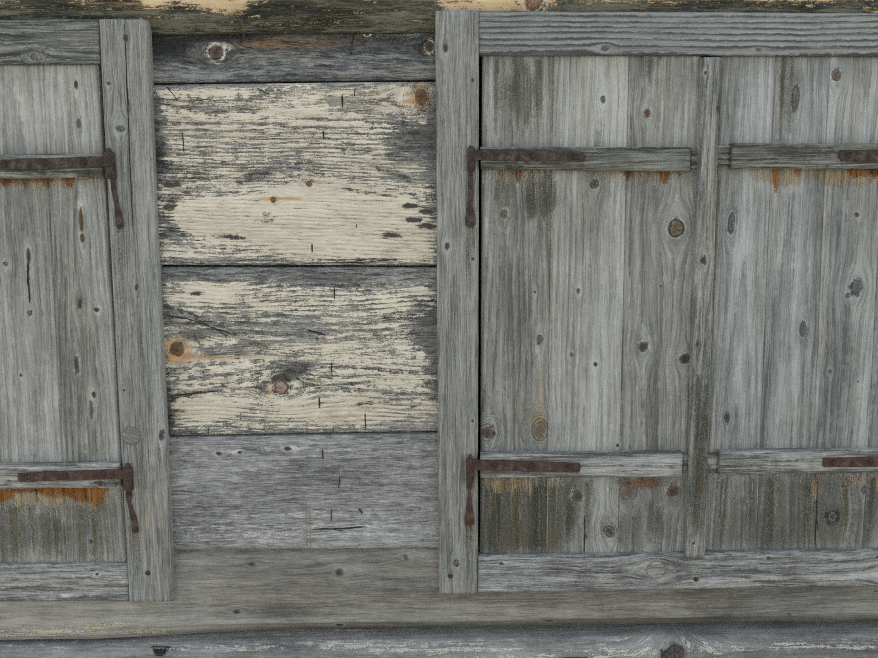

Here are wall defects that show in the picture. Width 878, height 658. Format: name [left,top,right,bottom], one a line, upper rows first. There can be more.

corrosion [0,178,92,189]
peeling [153,82,437,265]
corrosion [605,171,673,183]
corrosion [756,169,878,192]
peeling [162,277,438,434]
corrosion [0,487,122,509]